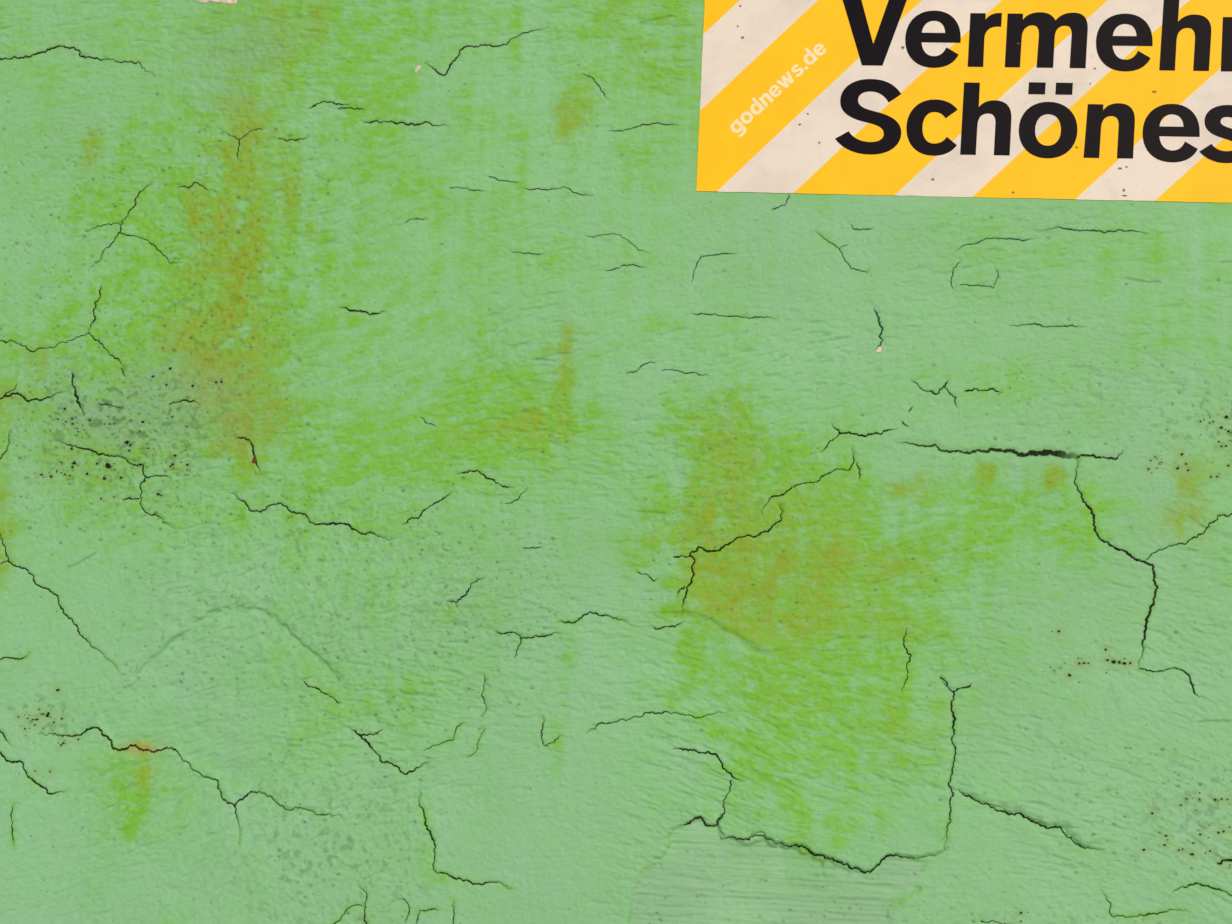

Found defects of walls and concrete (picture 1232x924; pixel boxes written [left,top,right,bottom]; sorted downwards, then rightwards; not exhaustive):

crack [0,45,145,70]
crack [0,185,176,376]
crack [0,534,104,654]
water stain [0,282,603,602]
crack [235,470,526,538]
water stain [556,380,1232,891]
crack [638,381,1232,696]
crack [0,730,60,795]
crack [49,726,331,827]
crack [352,676,502,924]
spalling [627,675,1114,924]
crack [940,677,1095,849]